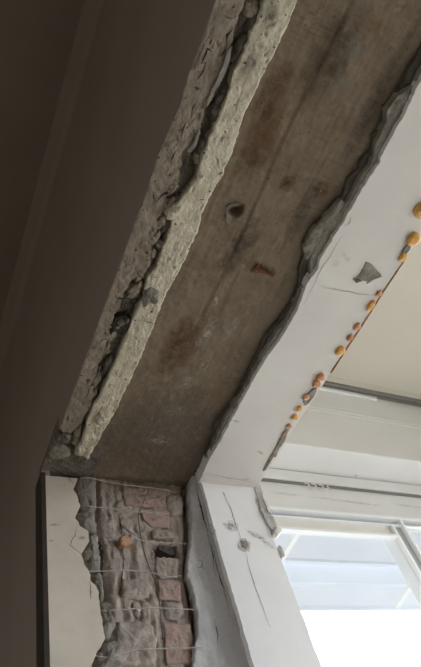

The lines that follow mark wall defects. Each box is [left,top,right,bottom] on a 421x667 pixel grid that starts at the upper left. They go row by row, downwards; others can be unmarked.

crack [114,0,259,315]
spalling [110,311,131,333]
spalling [141,287,159,308]
spalling [204,44,421,459]
crack [81,328,124,426]
flaking render [263,428,289,471]
spalling [39,417,192,667]